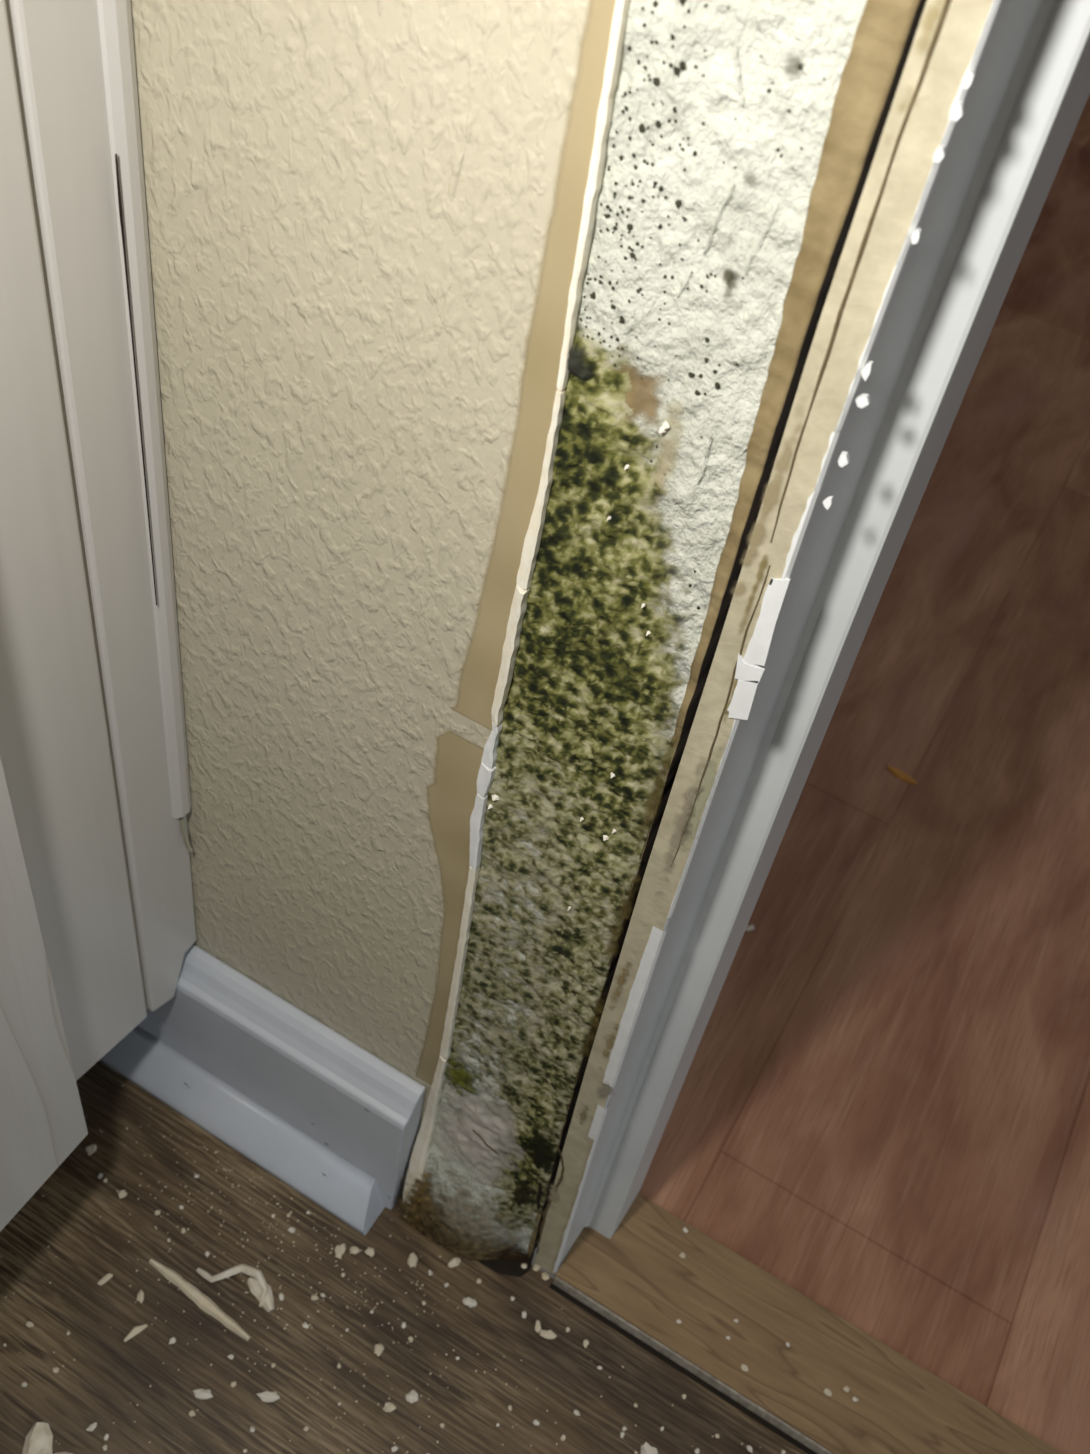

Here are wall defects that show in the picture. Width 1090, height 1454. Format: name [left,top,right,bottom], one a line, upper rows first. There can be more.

peeling [403,0,628,1218]
leakage [399,0,708,1261]
leakage [658,239,744,325]
leakage [688,337,738,396]
leakage [735,449,791,610]
peeling [527,0,1002,1273]